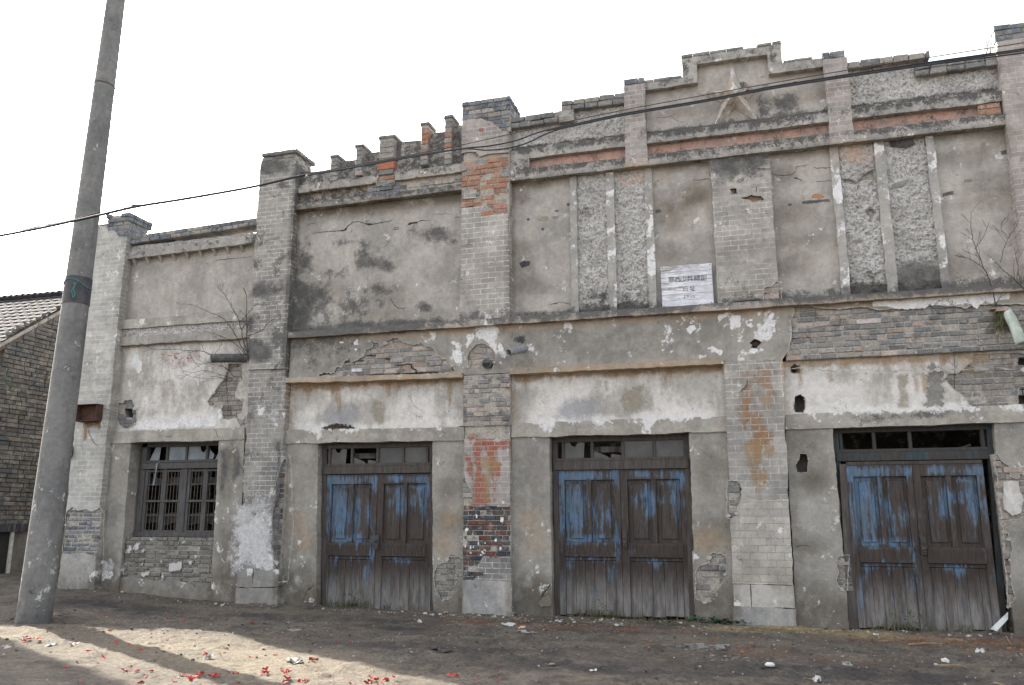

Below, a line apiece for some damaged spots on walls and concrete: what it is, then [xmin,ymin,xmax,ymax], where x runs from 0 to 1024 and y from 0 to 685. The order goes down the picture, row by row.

water stain [357,242,394,271]
crack [307,213,456,245]
flaking render [116,354,244,431]
water stain [325,303,439,330]
flaking render [316,330,512,427]
flaking render [781,293,1024,407]
flaking render [62,507,123,579]
flaking render [433,457,512,602]
flaking render [692,551,727,604]
flaking render [726,480,743,519]
flaking render [836,553,853,591]
flaking render [990,453,1024,609]